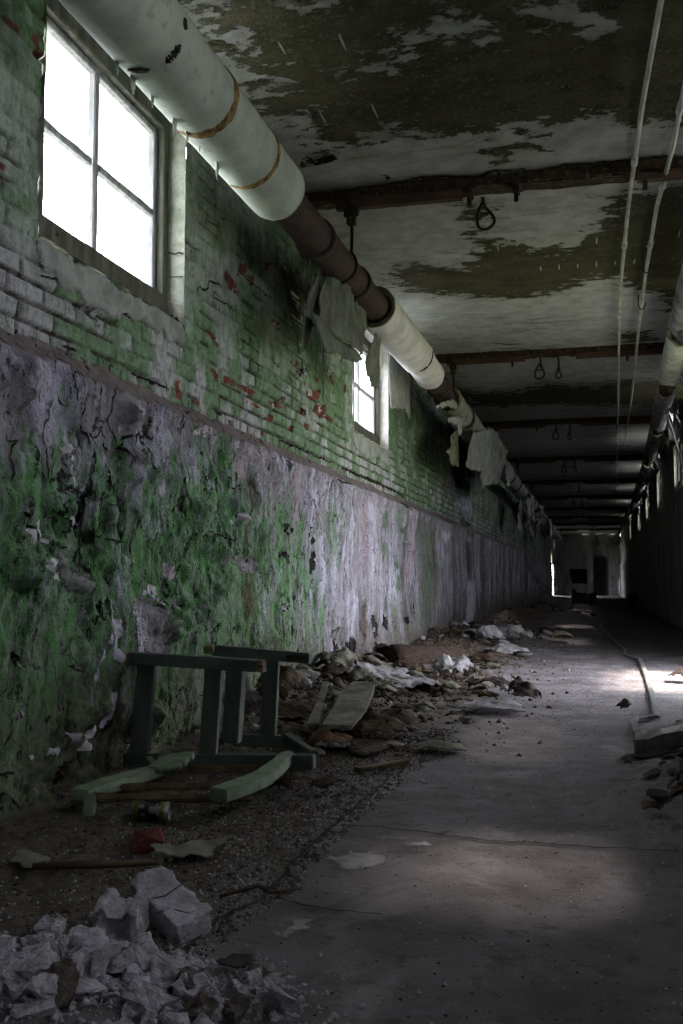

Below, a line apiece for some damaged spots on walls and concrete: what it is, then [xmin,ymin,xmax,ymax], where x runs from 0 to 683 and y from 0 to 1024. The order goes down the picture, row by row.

peeling [180,0,683,168]
peeling [379,183,683,313]
peeling [610,328,662,345]
crack [109,364,189,407]
flaking render [205,365,285,422]
flaking render [287,361,346,431]
crack [7,440,19,482]
crack [23,381,140,571]
water stain [94,600,126,683]
water stain [100,692,117,729]
flaking render [47,725,96,797]
crack [182,767,683,950]